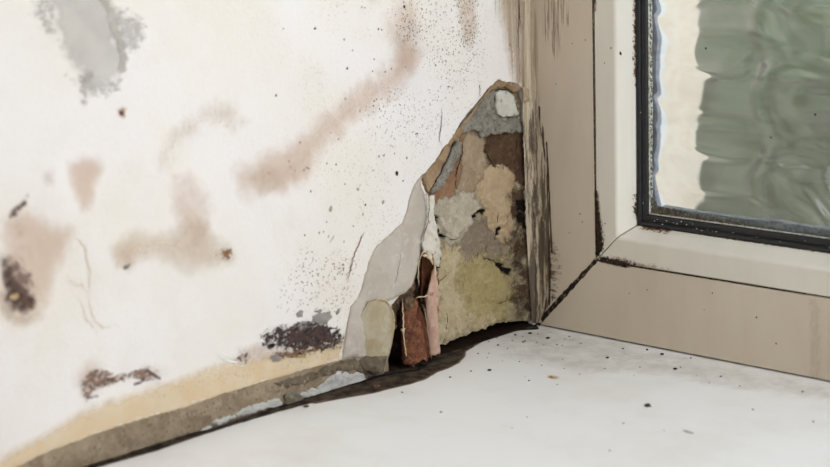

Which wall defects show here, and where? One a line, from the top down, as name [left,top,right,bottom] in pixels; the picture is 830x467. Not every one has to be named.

peeling [54,0,128,104]
leakage [2,259,35,312]
spalling [342,80,532,374]
leakage [538,106,556,315]
leakage [17,308,389,467]